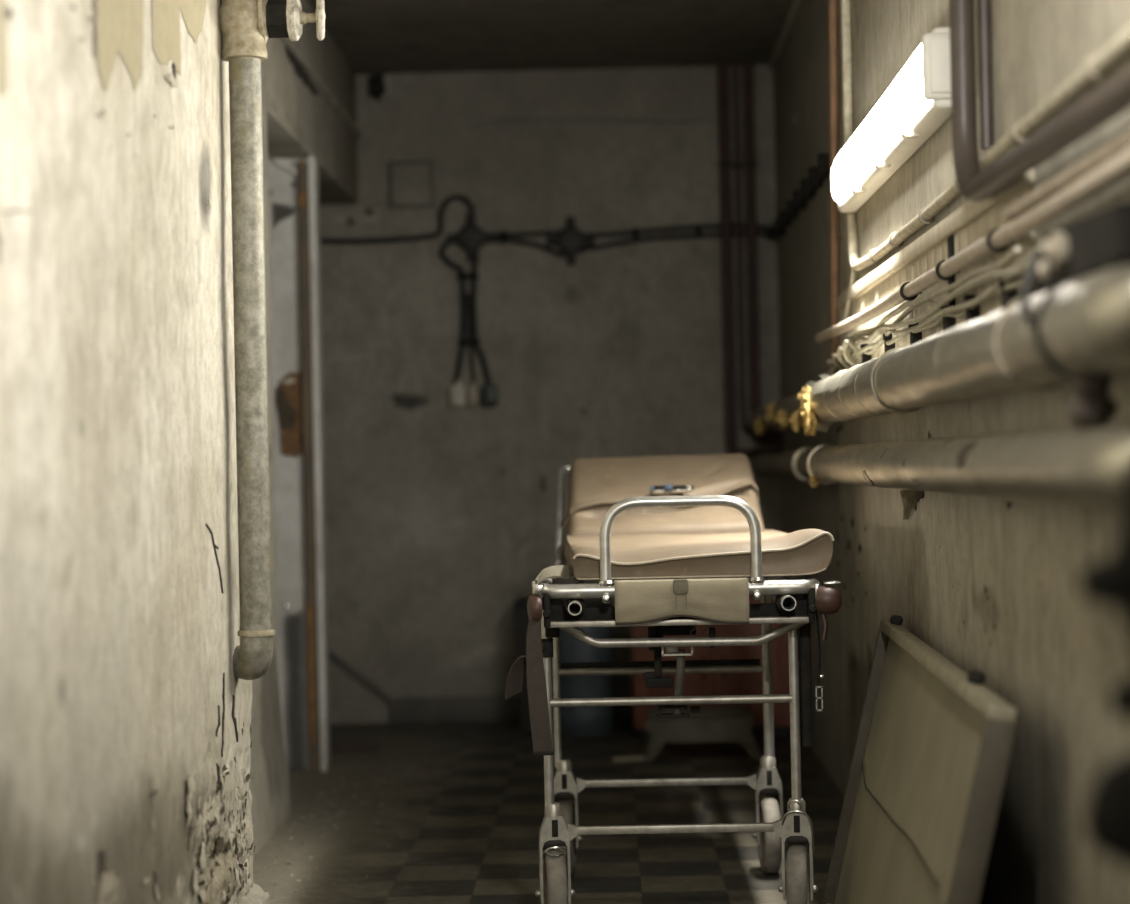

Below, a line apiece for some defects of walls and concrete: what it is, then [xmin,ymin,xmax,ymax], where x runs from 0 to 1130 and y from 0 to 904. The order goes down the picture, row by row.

peeling [82,0,206,91]
peeling [900,489,925,519]
crack [205,524,224,593]
crack [216,673,238,794]
spalling [186,757,255,904]